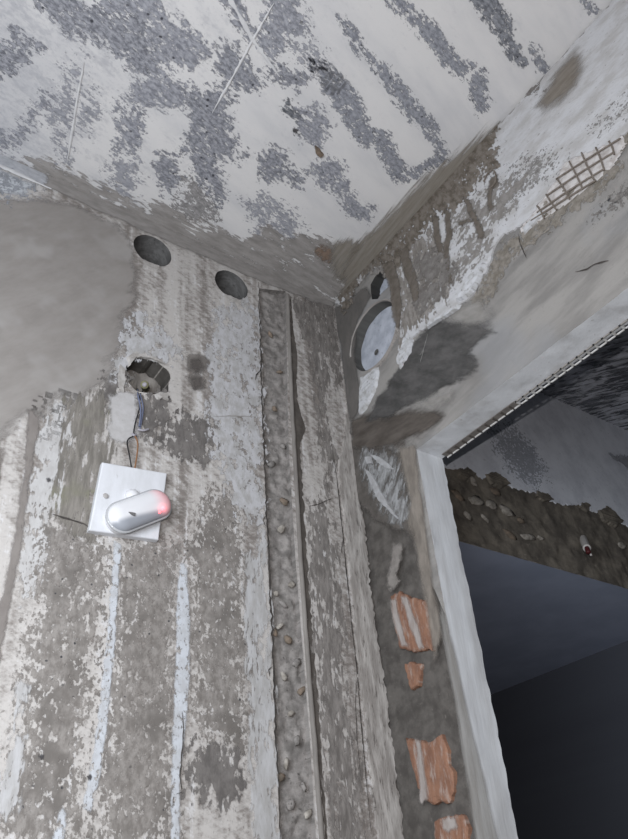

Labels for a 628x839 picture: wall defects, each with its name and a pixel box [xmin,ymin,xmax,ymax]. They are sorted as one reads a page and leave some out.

peeling [0,0,451,246]
leakage [525,56,580,107]
flaking render [384,0,628,369]
spalling [335,247,390,306]
leakage [335,123,529,537]
flaking render [338,361,404,839]
flaking render [391,591,435,690]
flaking render [406,734,457,805]
flaking render [434,814,473,839]